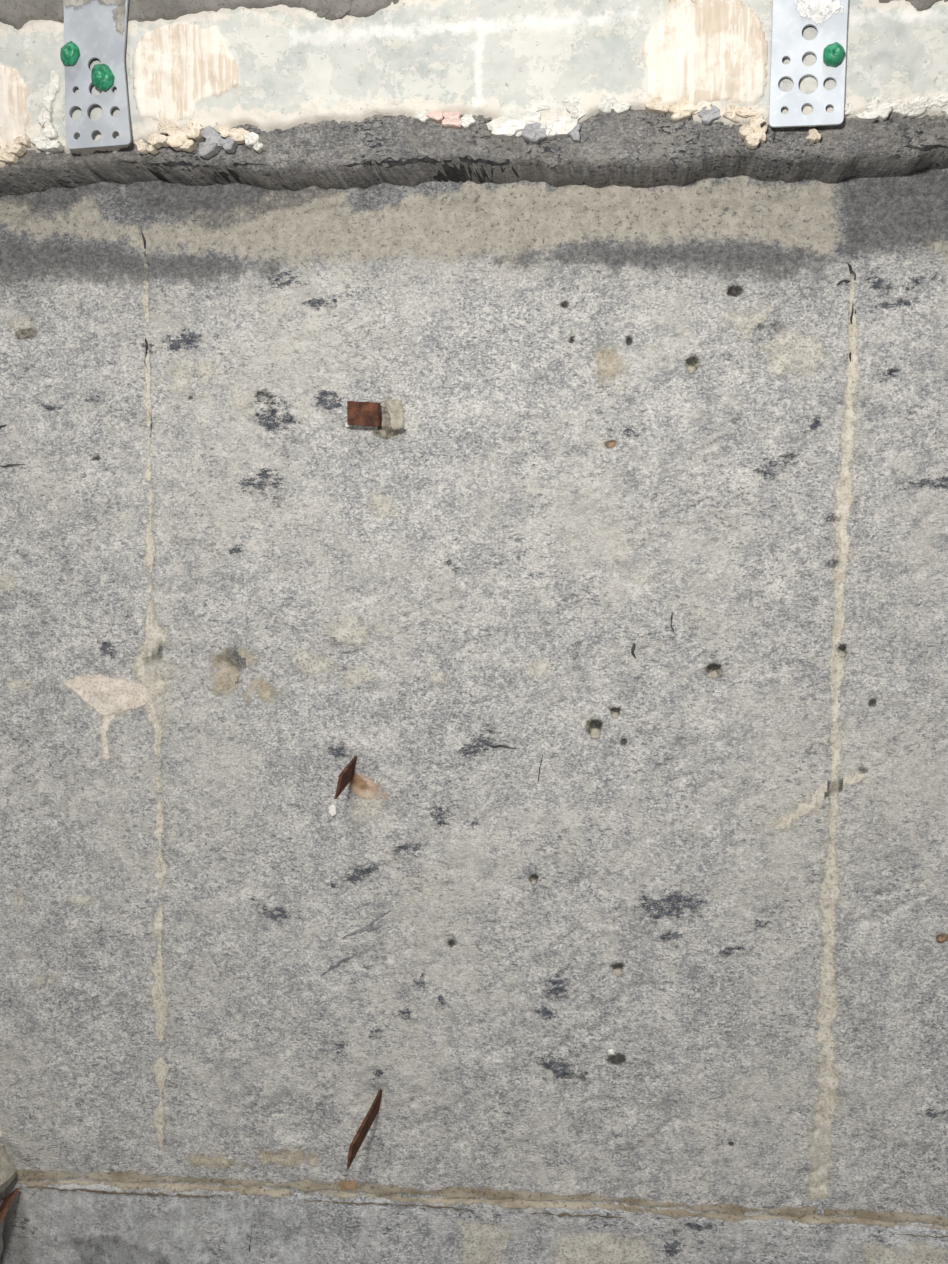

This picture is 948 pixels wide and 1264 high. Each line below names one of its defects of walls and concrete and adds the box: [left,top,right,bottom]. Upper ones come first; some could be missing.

peeling [316,0,358,19]
peeling [0,70,64,164]
peeling [134,120,266,159]
peeling [413,95,767,149]
peeling [804,128,821,144]
peeling [844,93,948,123]
crack [134,231,170,1150]
crack [772,262,866,1202]
corrosion [347,774,393,826]
crack [22,1186,234,1198]